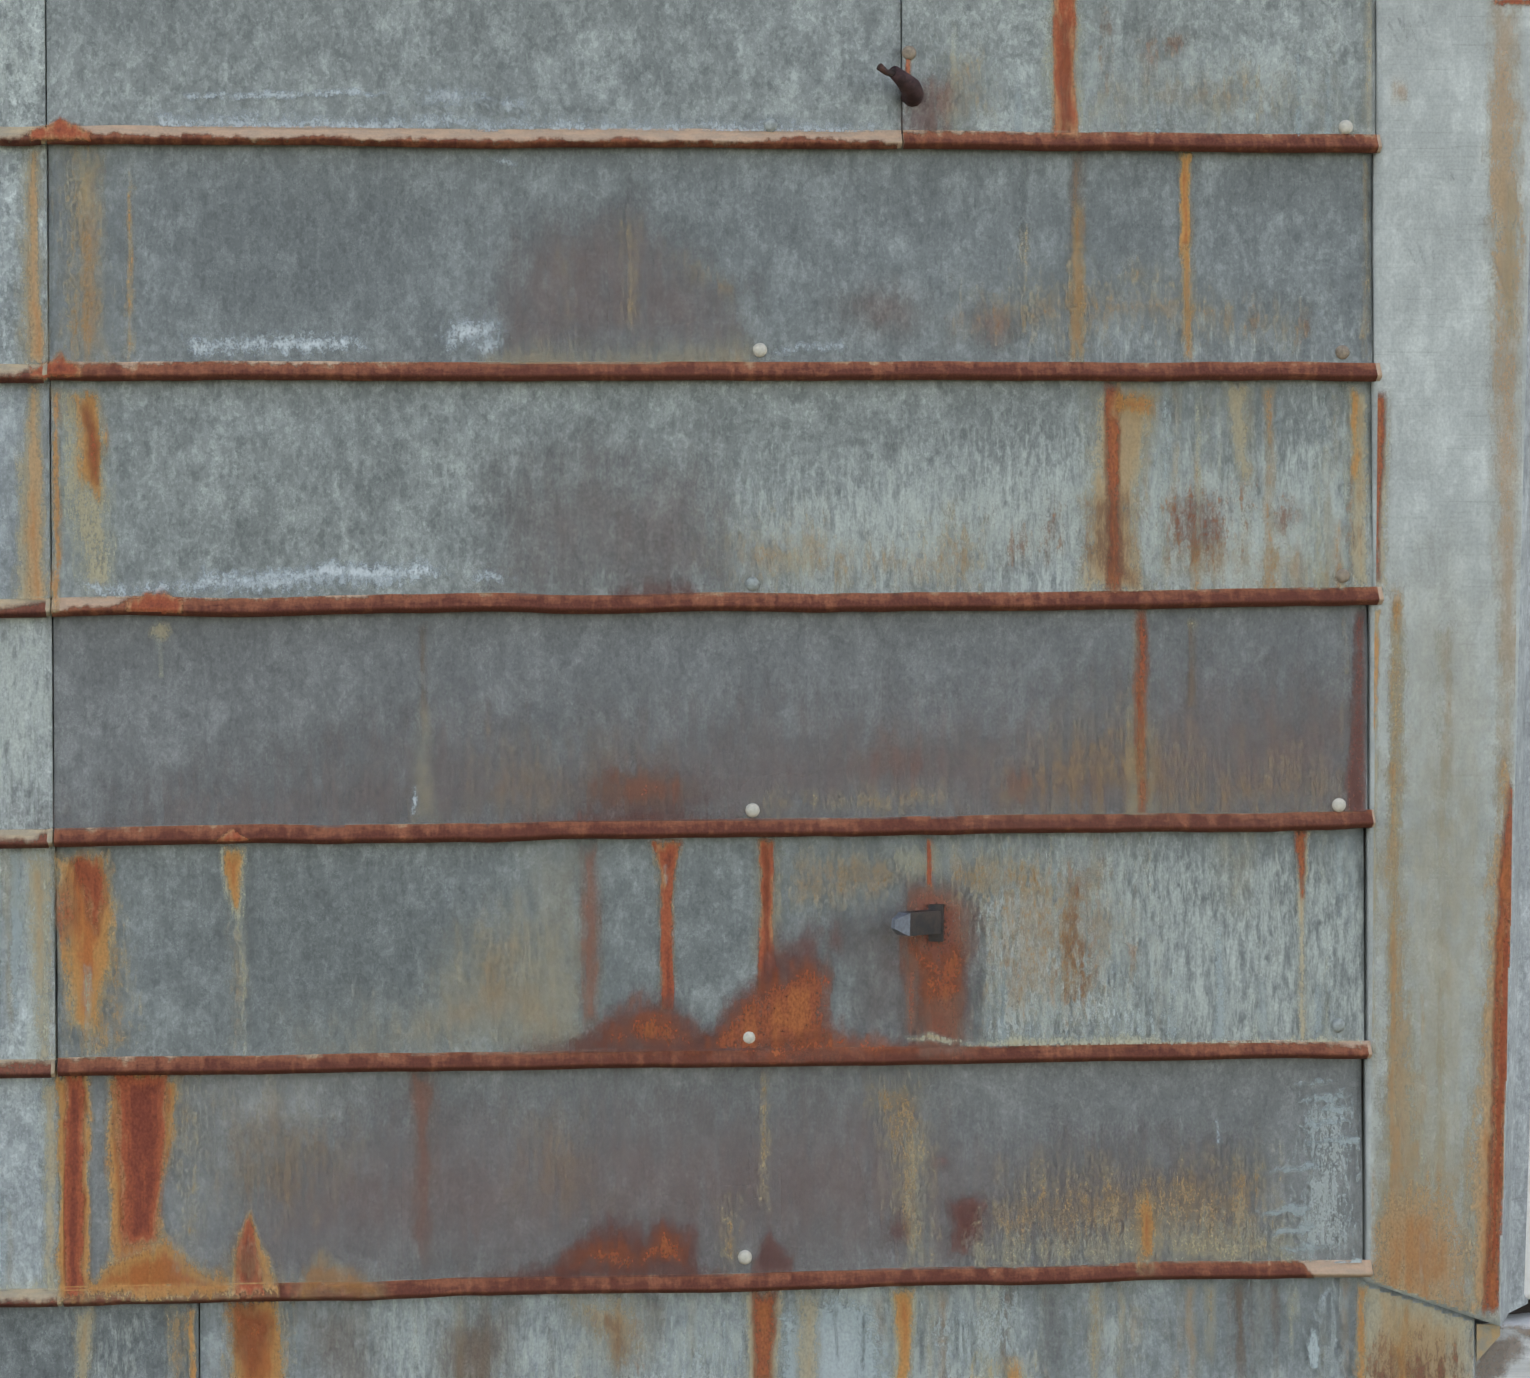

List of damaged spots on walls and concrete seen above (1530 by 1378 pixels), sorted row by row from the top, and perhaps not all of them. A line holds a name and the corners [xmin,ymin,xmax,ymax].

rust [158,111,409,129]
rust [187,89,381,100]
rust [0,118,1378,618]
rust [903,0,1379,356]
rust [0,386,1387,1378]
rust [1384,590,1419,1217]
rust [1355,761,1512,1378]